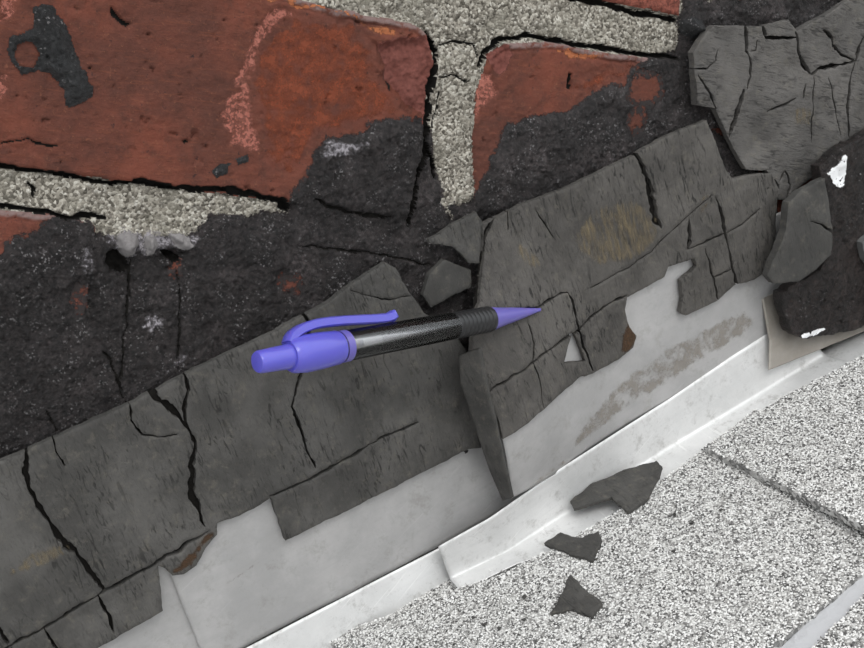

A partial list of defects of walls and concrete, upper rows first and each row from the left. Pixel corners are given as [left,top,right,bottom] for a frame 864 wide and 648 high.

crack [315,31,702,227]
crack [0,138,290,221]
spalling [105,249,127,272]
spalling [160,249,180,264]
crack [302,244,430,267]
peeling [420,211,483,307]
crack [102,259,143,434]
corrosion [622,325,636,352]
crack [147,270,204,561]
crack [291,406,314,465]
crack [22,447,128,630]
corrosion [173,533,214,573]